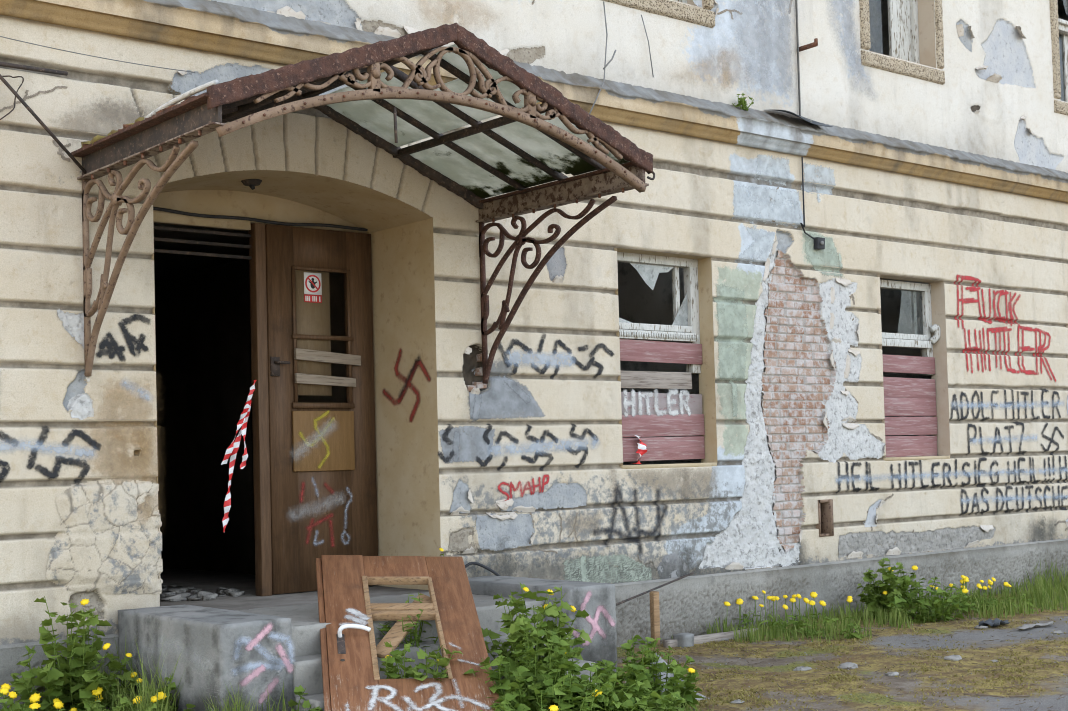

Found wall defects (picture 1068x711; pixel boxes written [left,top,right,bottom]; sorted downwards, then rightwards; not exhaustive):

spalling [209,0,423,38]
spalling [168,63,271,96]
peeling [956,19,1036,88]
peeling [1014,115,1064,170]
spalling [57,309,84,348]
spalling [63,369,94,420]
flaking render [657,229,886,579]
spalling [448,479,587,554]
spalling [838,499,996,558]